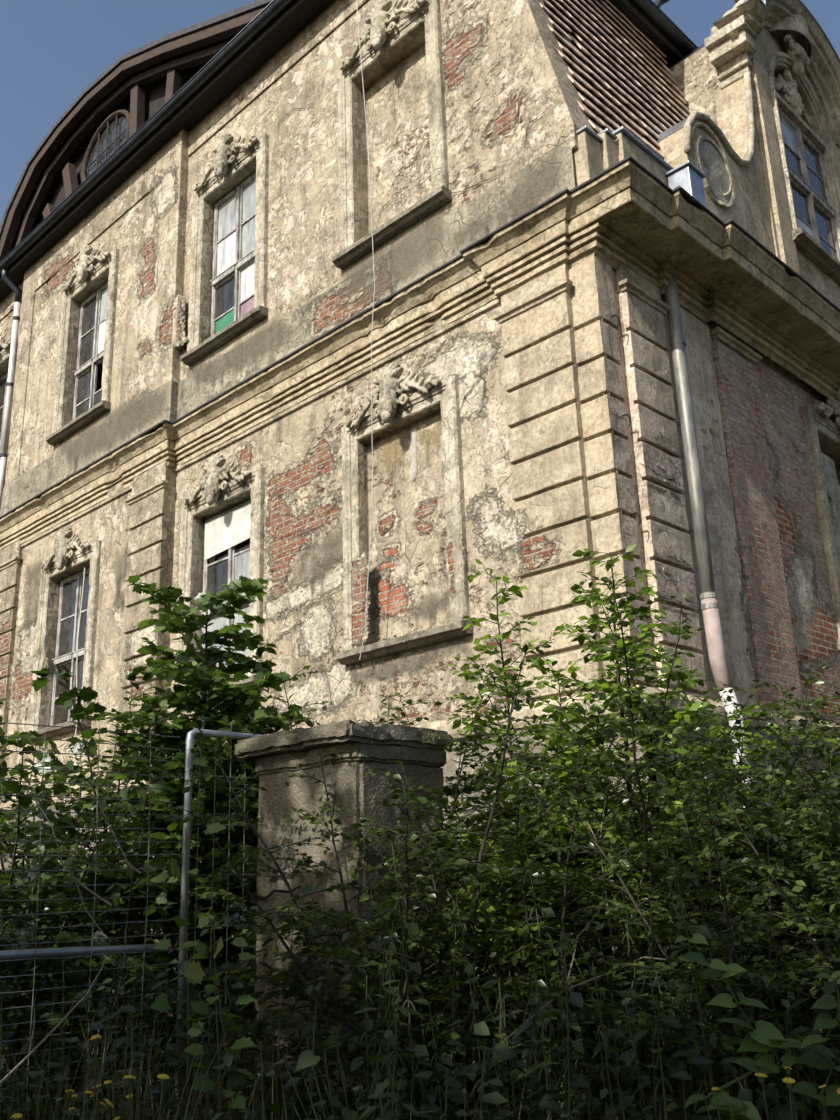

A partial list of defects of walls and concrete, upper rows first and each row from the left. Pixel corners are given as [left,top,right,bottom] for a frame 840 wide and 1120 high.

spalling [442,8,491,93]
spalling [135,166,183,305]
spalling [136,288,188,361]
spalling [309,256,402,341]
peeling [263,432,416,721]
spalling [414,494,438,540]
peeling [444,483,566,598]
spalling [700,399,758,677]
spalling [764,429,840,722]